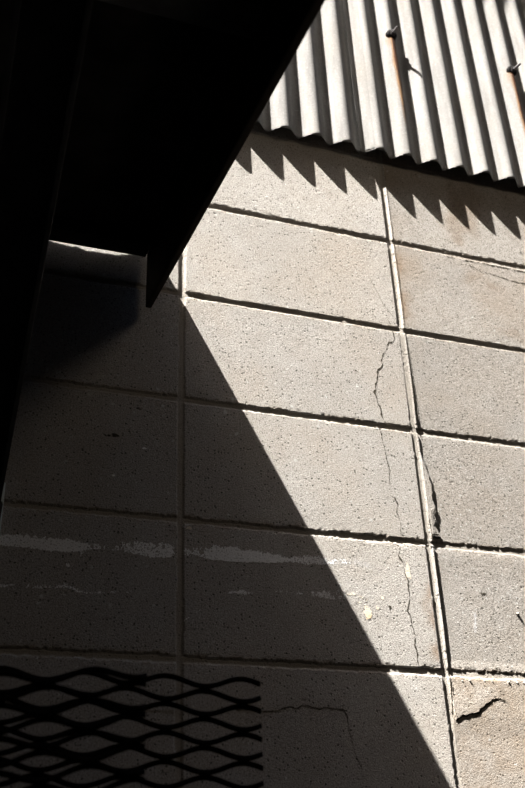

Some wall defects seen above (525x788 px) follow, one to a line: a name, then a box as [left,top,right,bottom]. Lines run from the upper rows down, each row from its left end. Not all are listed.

corrosion [390,37,405,109]
corrosion [510,72,525,130]
crack [371,172,419,665]